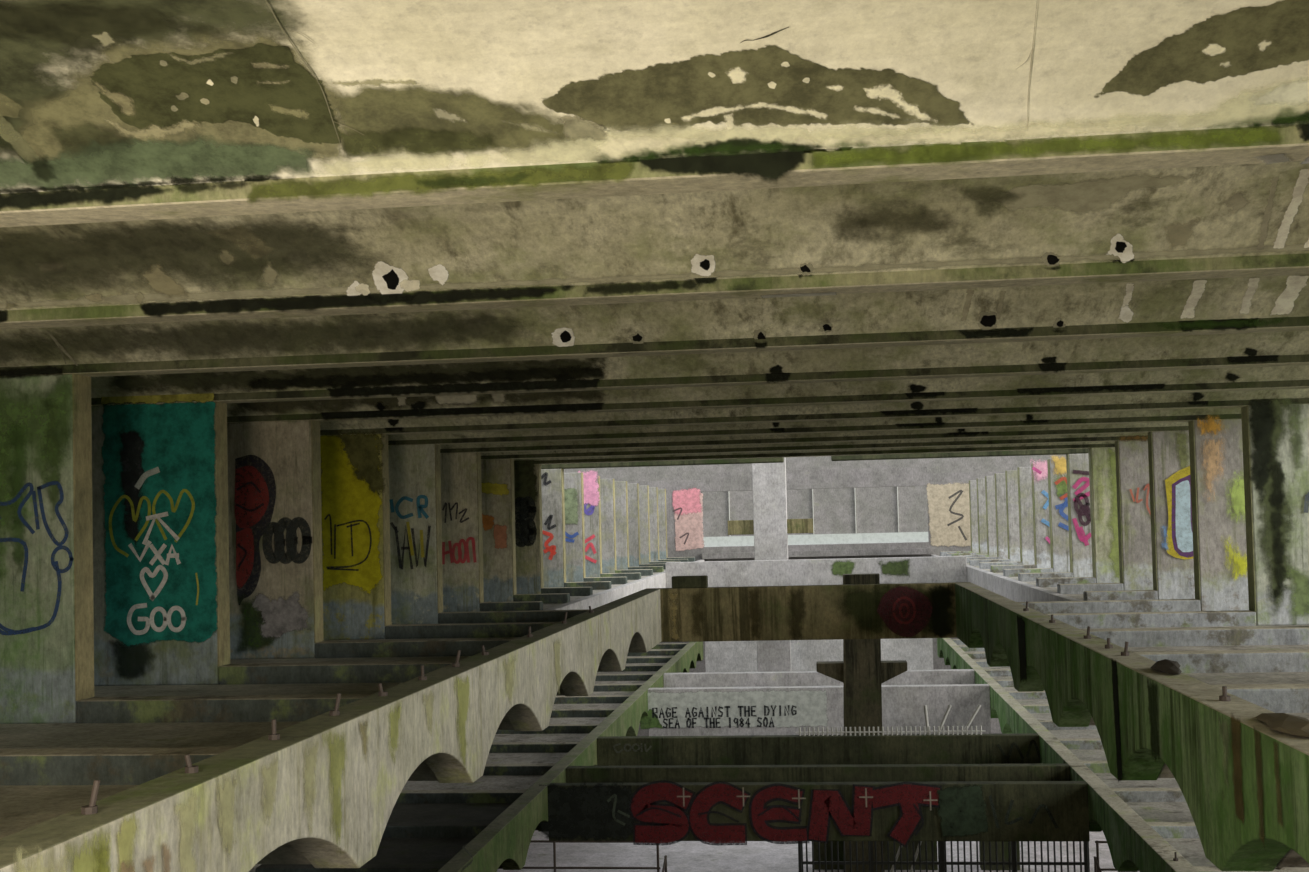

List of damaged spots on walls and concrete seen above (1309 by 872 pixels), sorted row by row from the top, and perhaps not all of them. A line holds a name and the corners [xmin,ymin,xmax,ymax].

peeling [1095,0,1309,98]
peeling [91,43,341,144]
damp [0,0,1309,214]
peeling [542,45,973,141]
spalling [346,261,449,302]
spalling [691,254,717,284]
spalling [1108,234,1134,263]
damp [1162,275,1309,332]
damp [1017,357,1165,395]
damp [1226,348,1279,382]
damp [1250,398,1309,616]
damp [111,641,153,678]